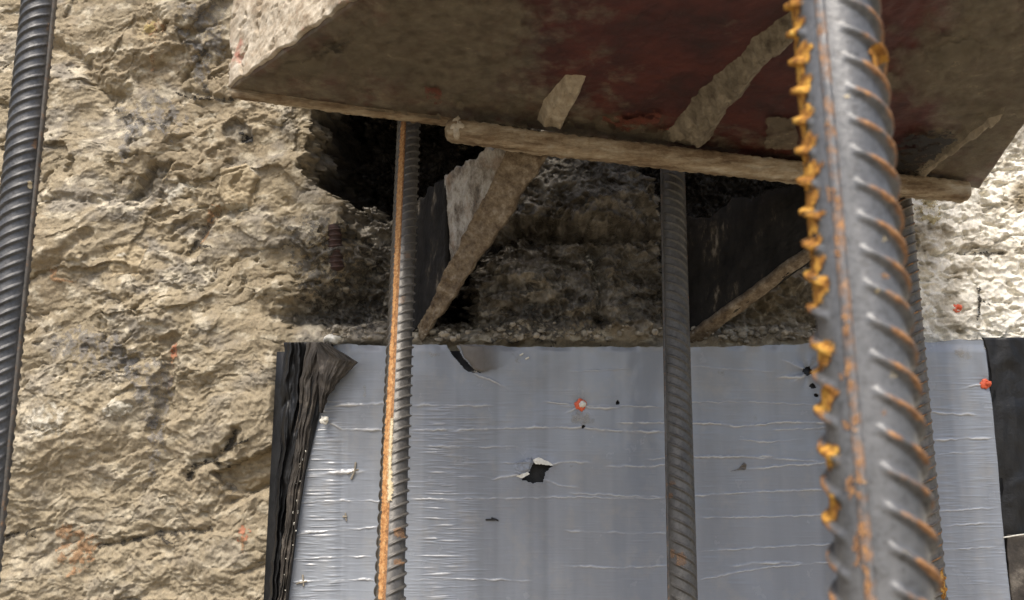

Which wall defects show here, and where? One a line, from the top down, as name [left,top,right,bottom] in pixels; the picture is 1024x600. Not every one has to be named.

peeling [563,119,690,148]
corrosion [914,199,941,225]